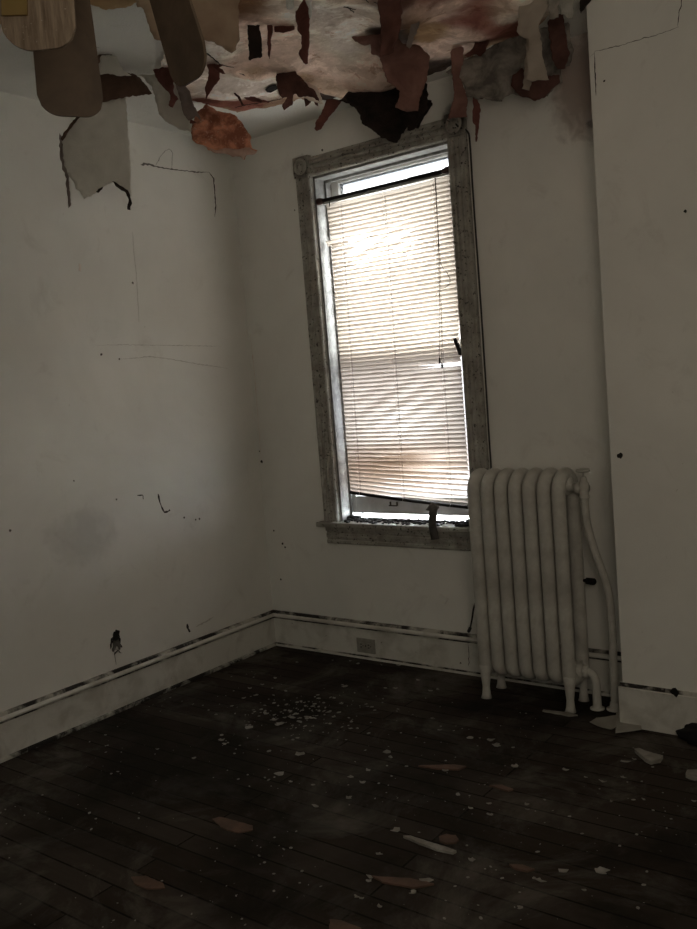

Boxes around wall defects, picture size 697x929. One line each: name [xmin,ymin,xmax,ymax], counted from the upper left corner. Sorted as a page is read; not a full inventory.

flaking render [446,0,591,142]
crack [141,150,216,213]
spalling [110,630,122,662]